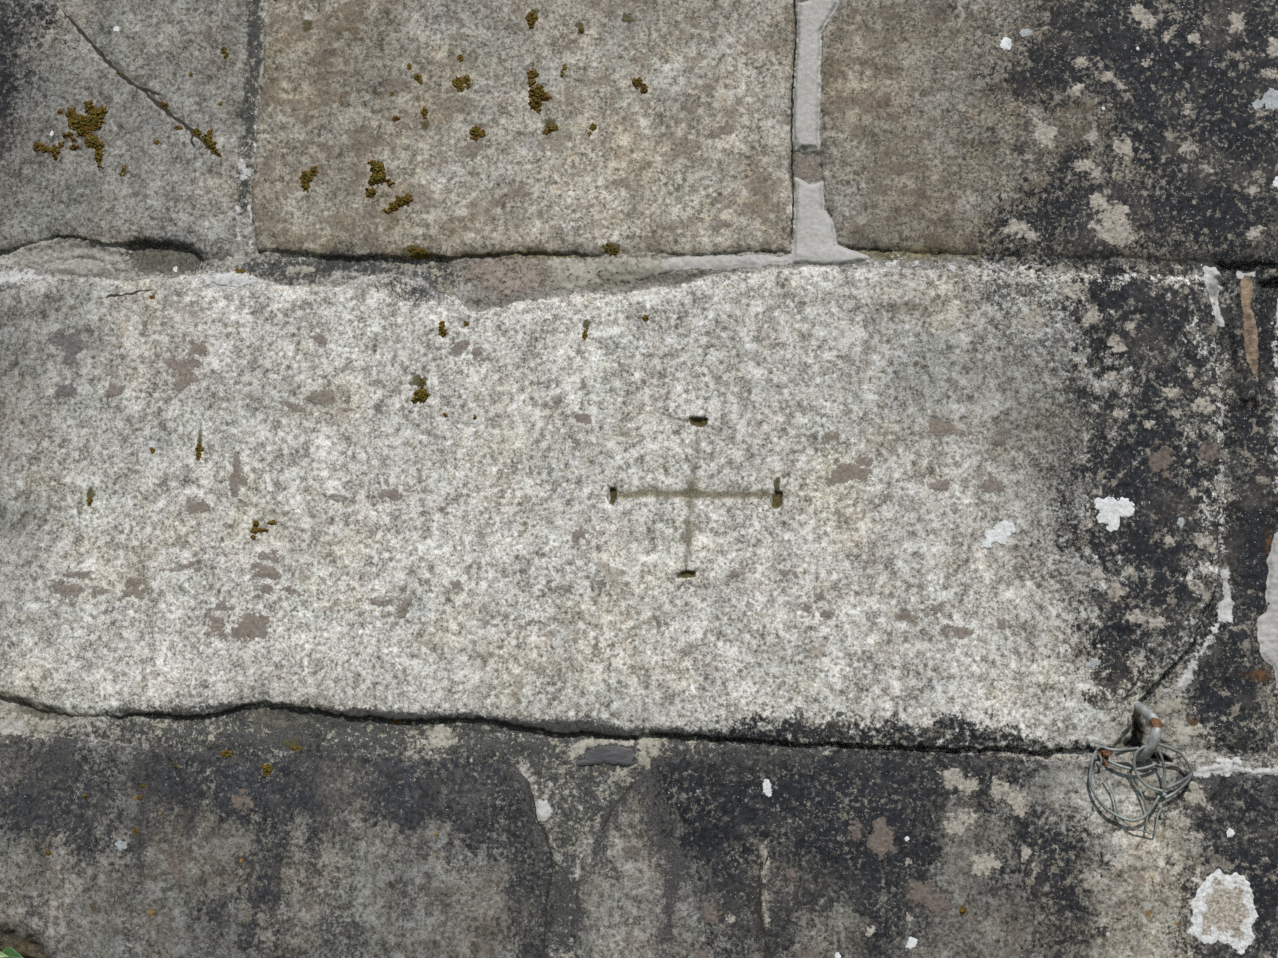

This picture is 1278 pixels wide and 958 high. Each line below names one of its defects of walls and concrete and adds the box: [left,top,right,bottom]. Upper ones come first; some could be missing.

crack [61,8,220,156]
water stain [972,0,1278,958]
water stain [0,730,558,958]
water stain [637,708,1125,958]